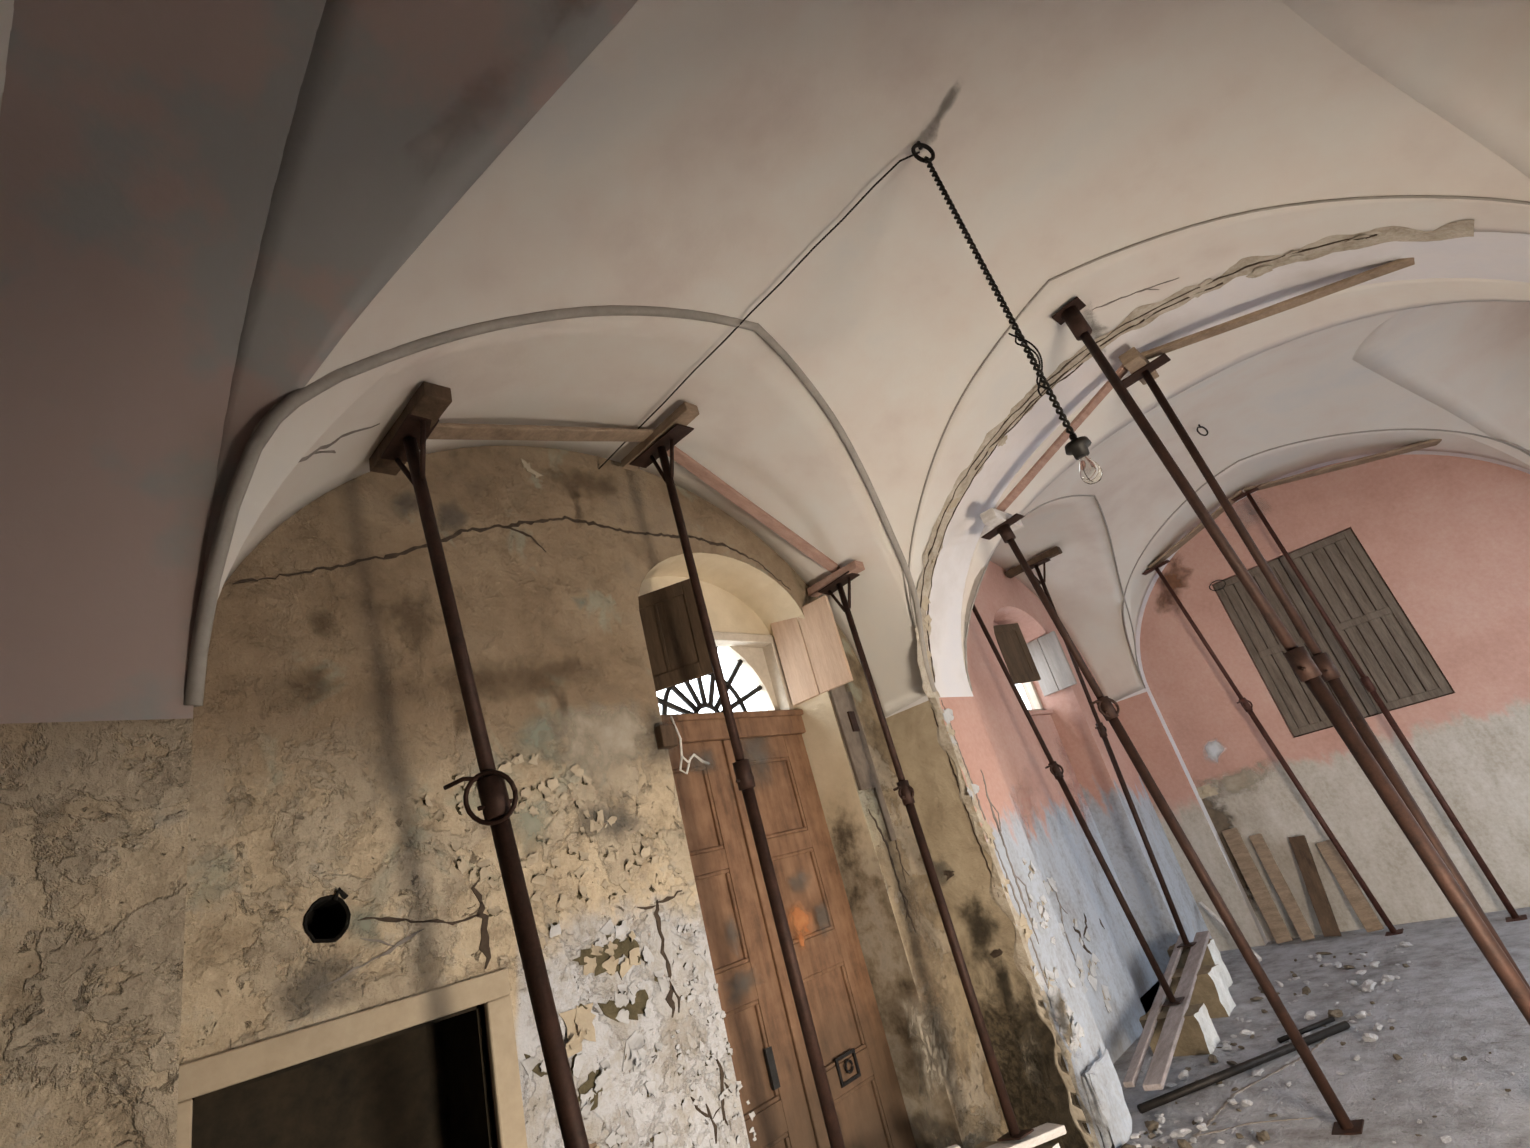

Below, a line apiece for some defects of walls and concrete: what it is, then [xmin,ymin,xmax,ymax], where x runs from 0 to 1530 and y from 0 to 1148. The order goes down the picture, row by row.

crack [233,516,791,590]
spalling [915,220,1474,1148]
peeling [422,773,478,822]
peeling [450,841,503,917]
crack [319,880,491,988]
peeling [498,753,757,1148]